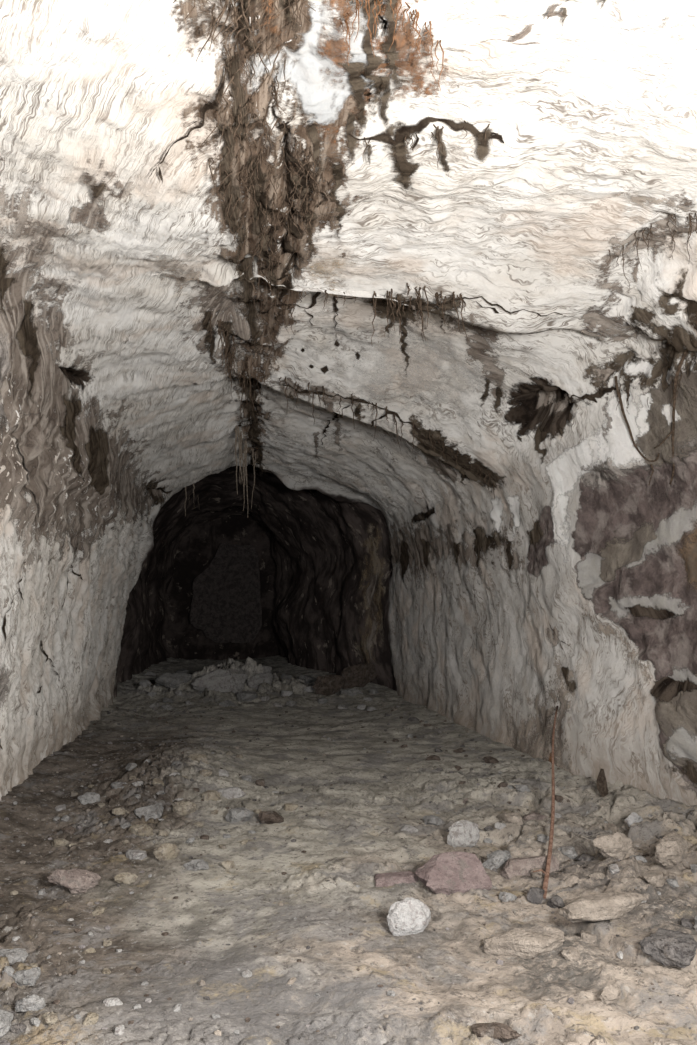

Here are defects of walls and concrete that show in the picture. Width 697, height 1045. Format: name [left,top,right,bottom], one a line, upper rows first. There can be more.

water stain [385,121,420,190]
water stain [434,129,450,175]
water stain [477,129,492,162]
water stain [172,0,372,472]
water stain [382,300,427,371]
water stain [0,247,109,519]
peeling [572,361,697,795]